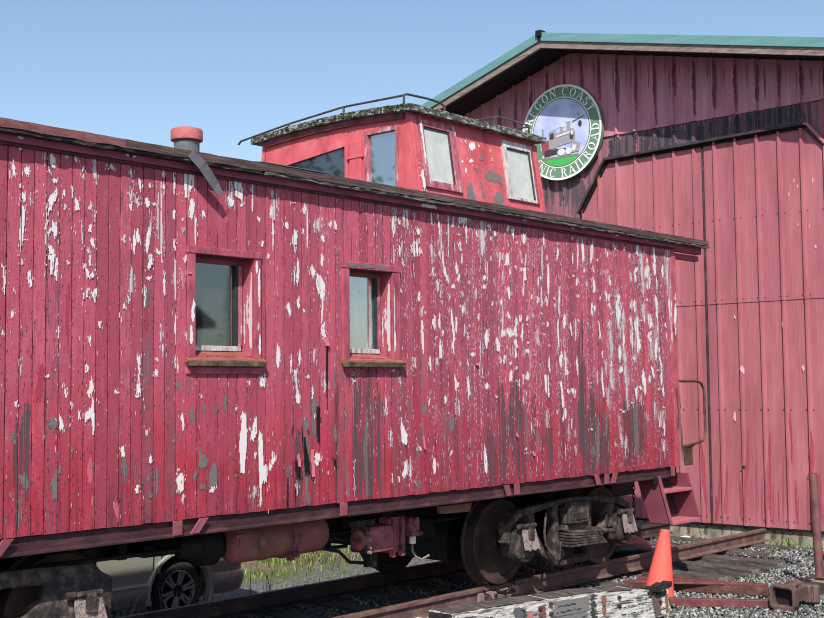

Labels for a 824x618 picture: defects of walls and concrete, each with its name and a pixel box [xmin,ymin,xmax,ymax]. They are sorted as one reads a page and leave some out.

leakage [612,60,657,124]
leakage [706,63,766,112]
peeling [37,153,80,281]
peeling [227,181,308,258]
leakage [541,174,586,216]
peeling [48,364,97,435]
peeling [179,394,290,509]
leakage [348,367,386,500]
peeling [390,203,479,382]
leakage [487,364,565,485]
leakage [578,313,610,475]
peeling [571,227,678,457]